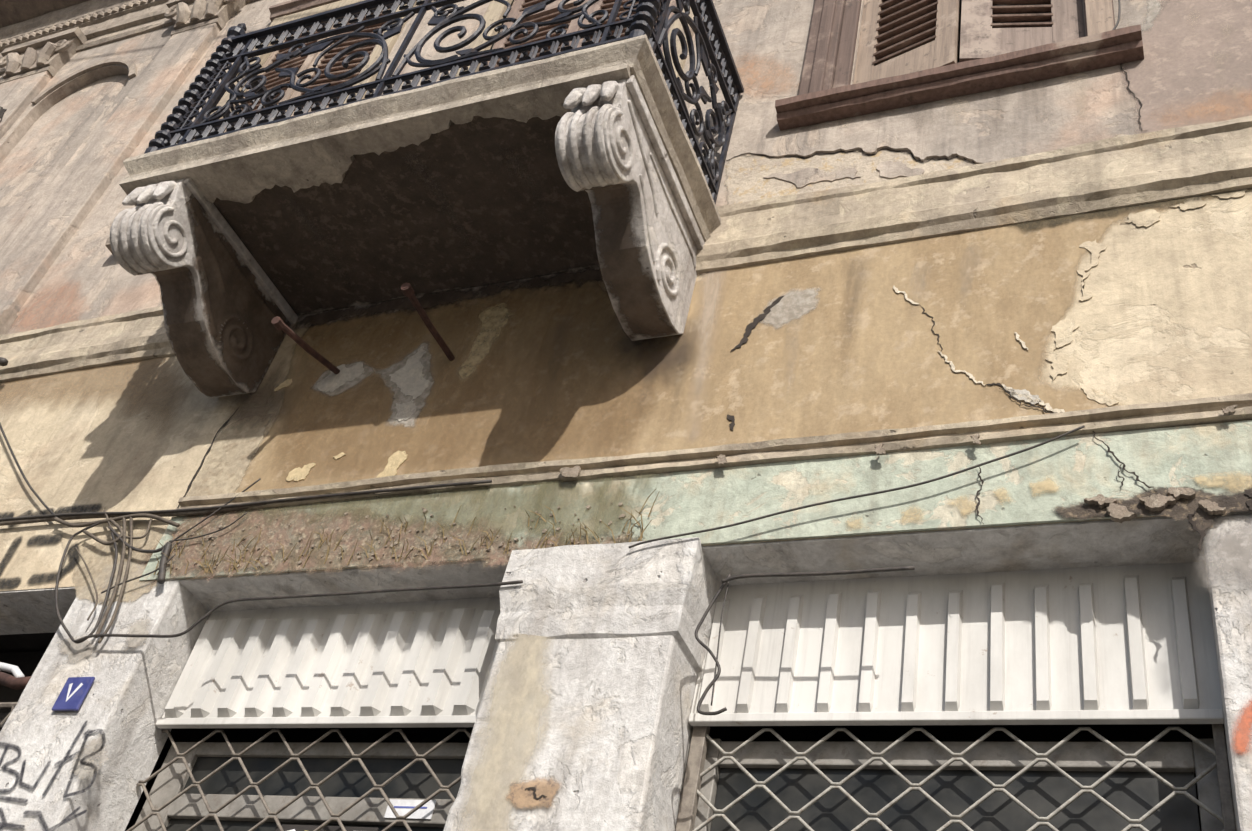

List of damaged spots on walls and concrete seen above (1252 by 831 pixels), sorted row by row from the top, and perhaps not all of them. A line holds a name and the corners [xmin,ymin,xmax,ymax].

crack [1120,63,1142,129]
spalling [119,63,631,315]
peeling [1120,189,1248,228]
peeling [1077,239,1107,302]
spalling [731,289,818,351]
crack [893,286,1065,414]
peeling [1045,316,1079,381]
peeling [312,343,434,427]
peeling [1081,387,1119,407]
crack [1092,431,1155,491]
crack [976,467,984,524]
spalling [1055,473,1252,550]